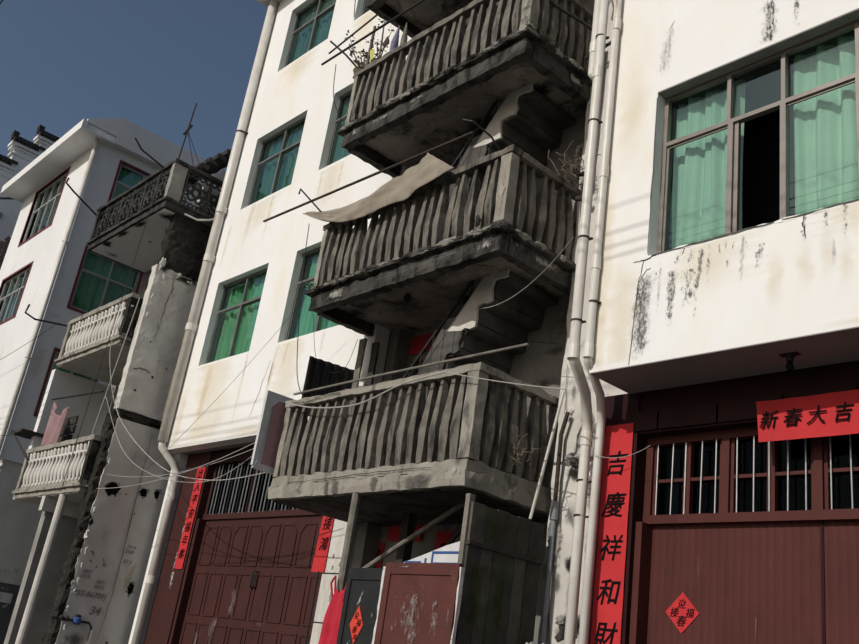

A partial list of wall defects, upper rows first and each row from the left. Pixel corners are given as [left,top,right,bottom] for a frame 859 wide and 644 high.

peeling [0,236,11,269]
water stain [666,246,733,317]
water stain [633,278,650,351]
spalling [104,481,127,497]
spalling [138,487,162,501]